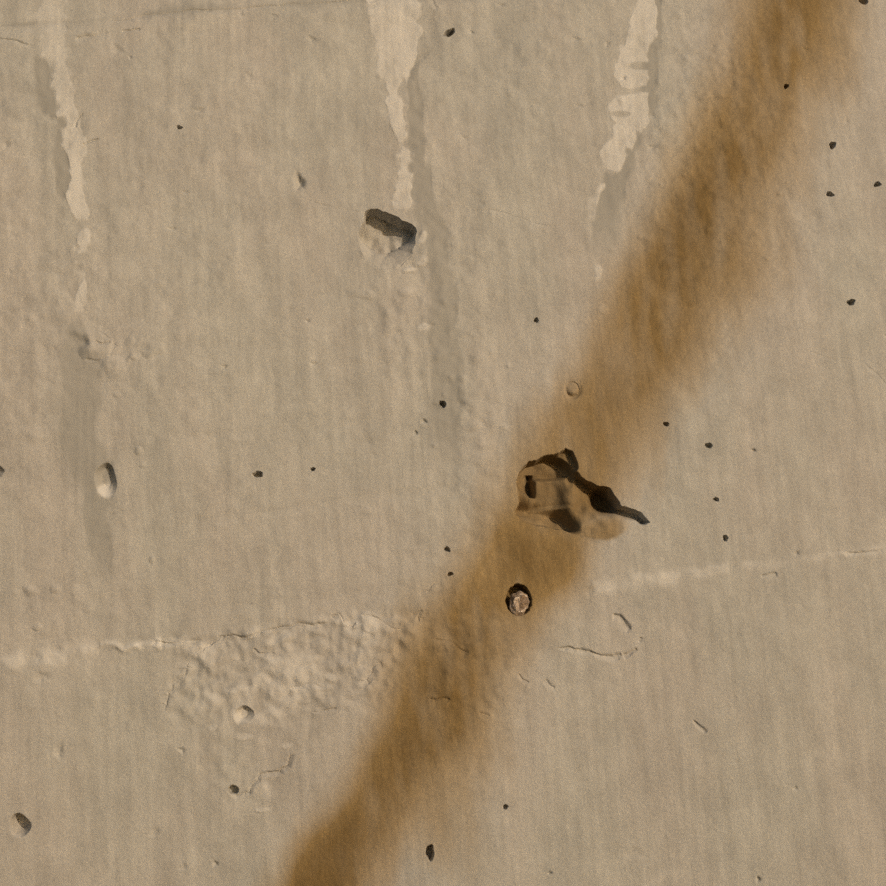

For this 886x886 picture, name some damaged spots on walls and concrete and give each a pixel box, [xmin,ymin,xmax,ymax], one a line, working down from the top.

damp [32,30,115,577]
spalling [357,207,429,275]
damp [366,0,467,494]
damp [587,0,664,261]
corrosion [252,0,879,886]
spalling [514,447,652,544]
crack [517,673,556,692]
crack [556,612,644,662]